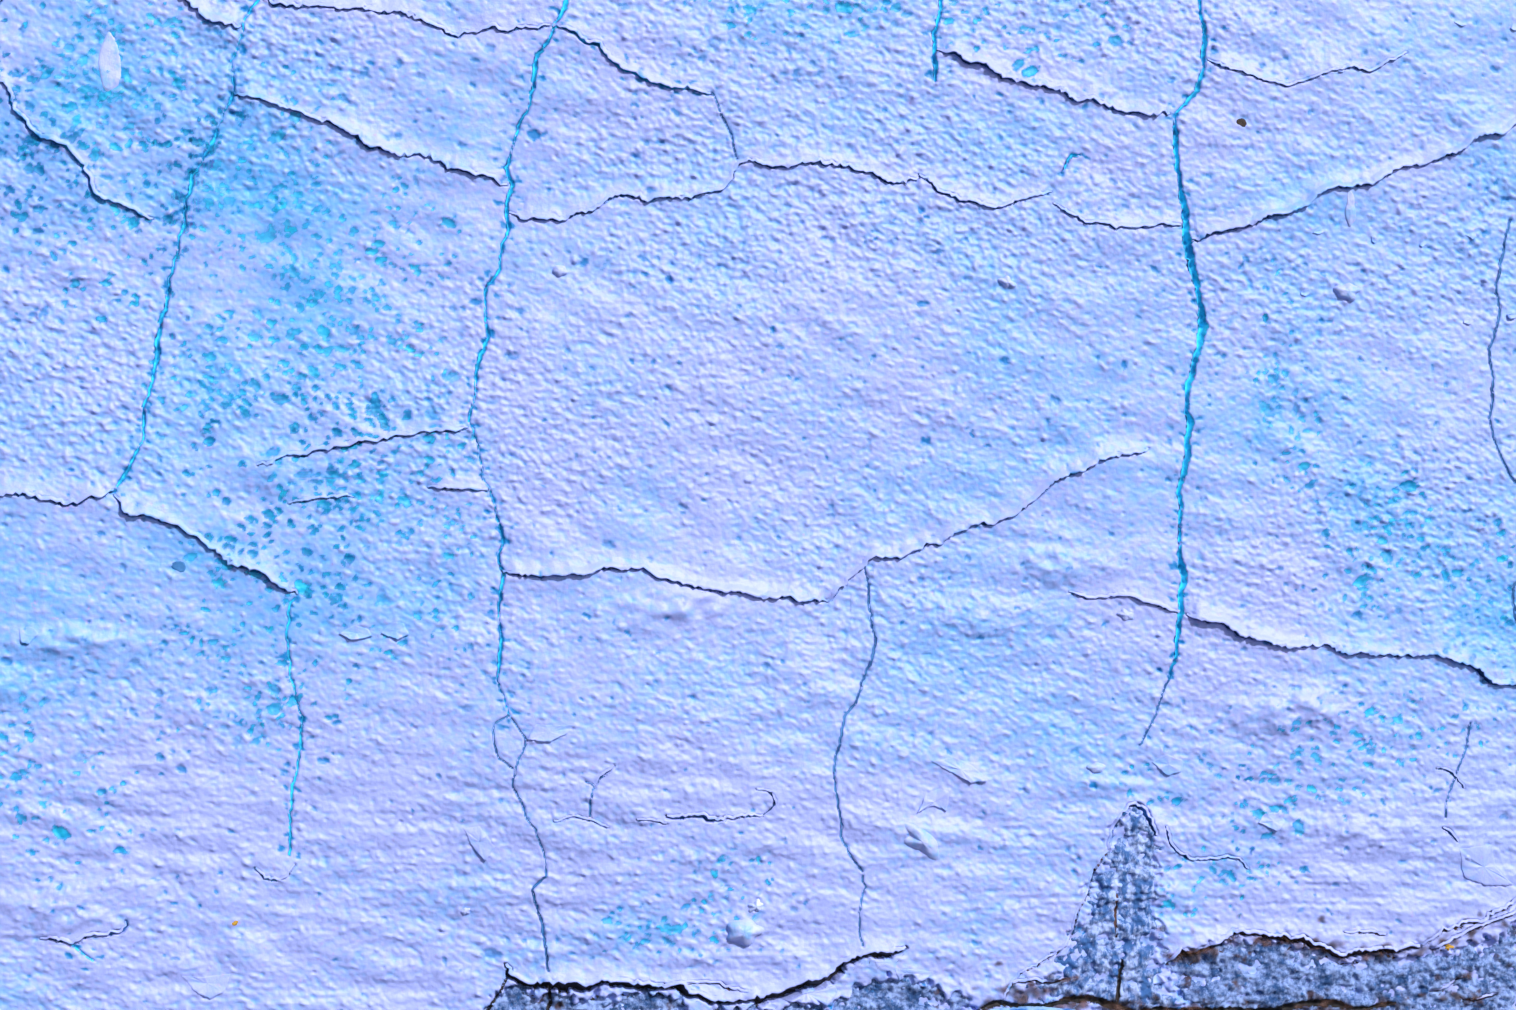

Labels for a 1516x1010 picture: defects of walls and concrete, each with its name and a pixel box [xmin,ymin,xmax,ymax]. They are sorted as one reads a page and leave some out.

crack [932,0,1516,745]
crack [0,0,1149,1010]
crack [1437,722,1472,842]
spalling [483,982,687,1010]
spalling [779,969,976,1010]
crack [977,801,1516,1010]
spalling [1014,806,1516,1010]